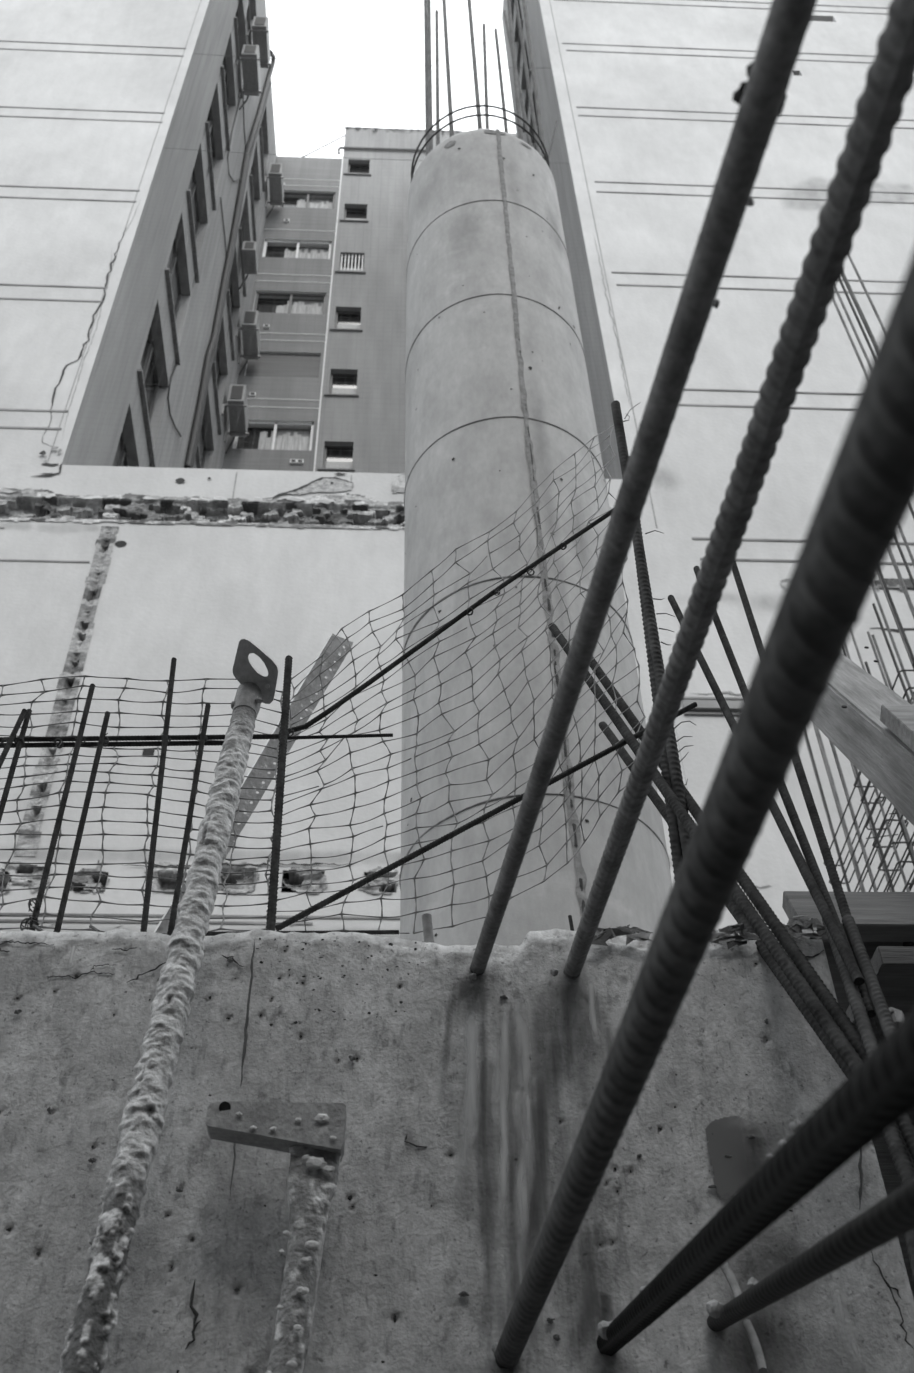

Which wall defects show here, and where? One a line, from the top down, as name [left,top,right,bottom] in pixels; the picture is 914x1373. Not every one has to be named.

spalling [0,446,405,530]
water stain [468,1019,476,1109]
water stain [501,1020,530,1217]